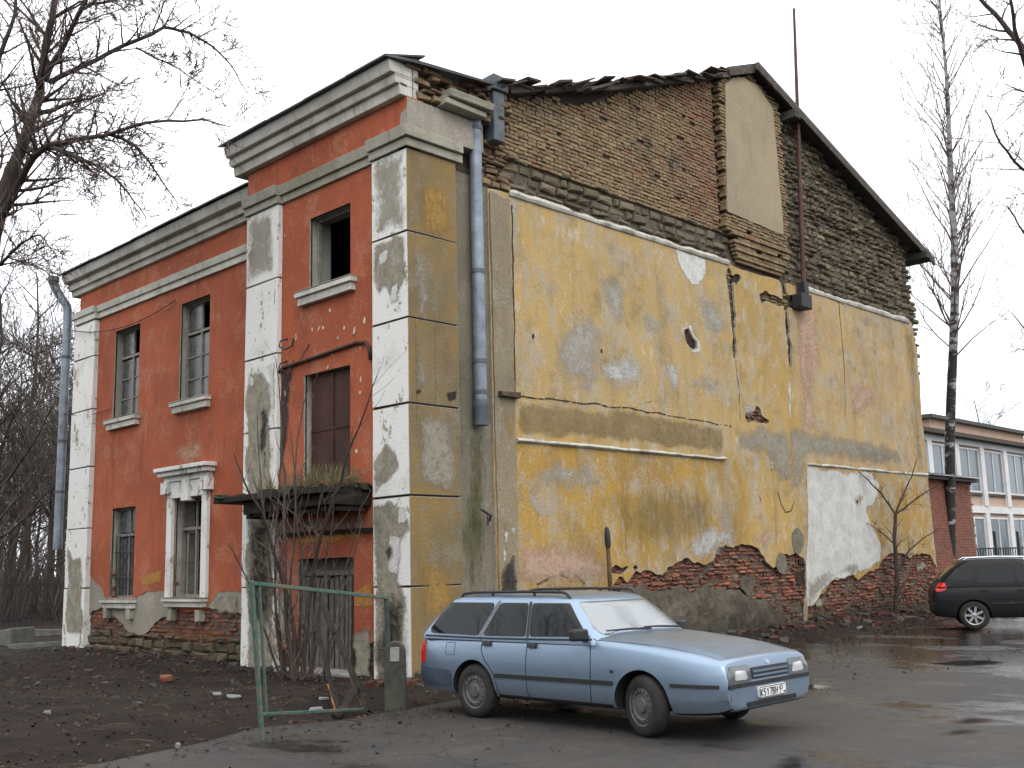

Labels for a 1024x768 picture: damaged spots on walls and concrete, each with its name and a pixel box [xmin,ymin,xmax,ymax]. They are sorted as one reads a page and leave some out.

peeling [374,159,405,303]
crack [511,205,741,427]
peeling [676,250,706,285]
spalling [683,325,701,353]
peeling [245,363,286,494]
peeling [374,444,398,489]
damp [520,405,723,448]
flaking render [745,407,768,424]
peeling [65,550,83,633]
peeling [214,519,292,668]
peeling [353,501,409,679]
flaking render [520,510,939,632]